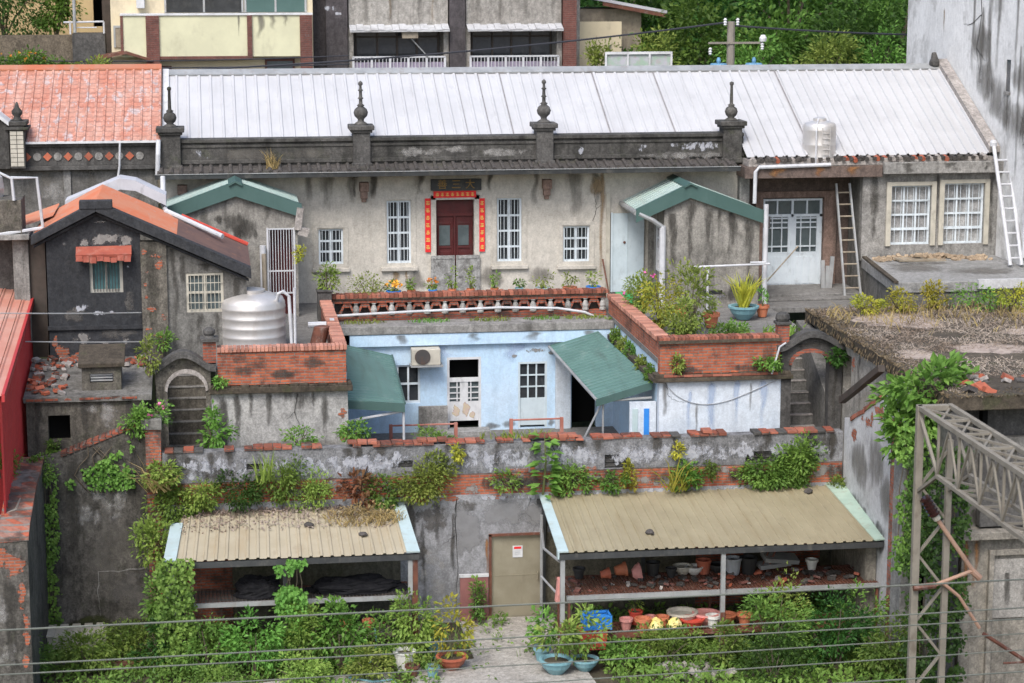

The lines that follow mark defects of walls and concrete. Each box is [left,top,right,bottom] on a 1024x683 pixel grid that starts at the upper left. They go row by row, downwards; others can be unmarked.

water stain [973,0,991,60]
peeling [671,141,718,151]
peeling [80,234,131,246]
spalling [142,249,167,320]
water stain [669,203,695,261]
water stain [707,212,755,300]
water stain [273,370,292,379]
peeling [180,457,247,481]
peeling [263,451,459,503]
water stain [785,433,890,513]